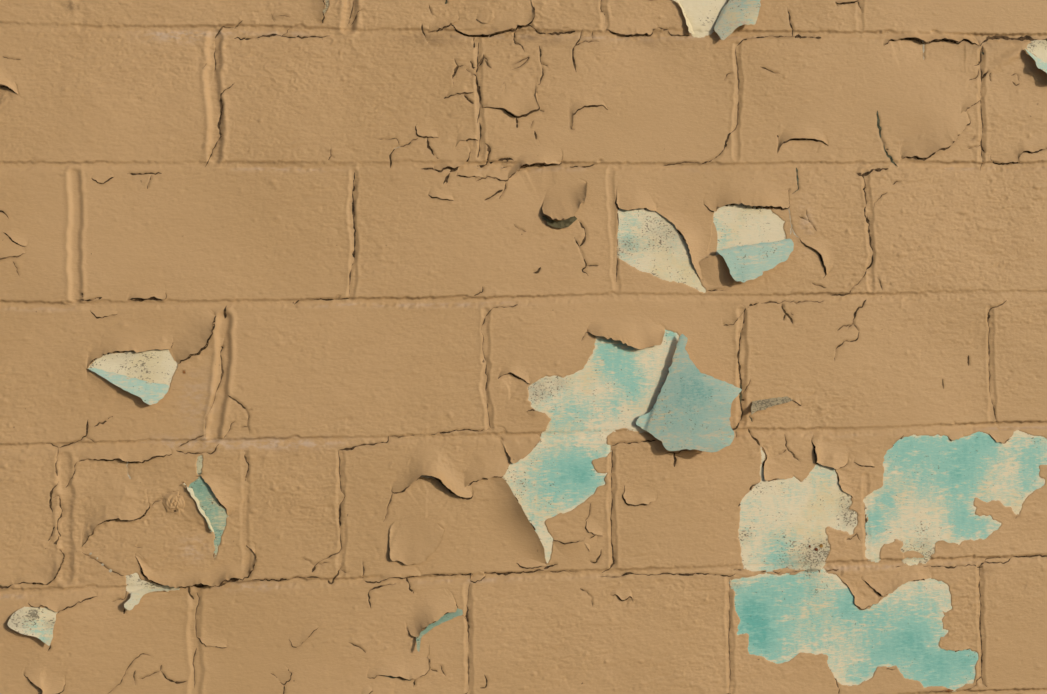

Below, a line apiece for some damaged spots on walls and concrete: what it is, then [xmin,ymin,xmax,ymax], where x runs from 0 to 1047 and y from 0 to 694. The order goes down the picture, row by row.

crack [422,25,575,186]
peeling [606,0,761,40]
peeling [1011,40,1047,101]
peeling [81,293,216,425]
peeling [615,163,839,293]
crack [732,168,898,437]
crack [46,416,113,536]
crack [109,593,200,693]
peeling [66,434,256,614]
peeling [362,314,742,687]
crack [429,440,839,694]
peeling [730,392,1047,692]